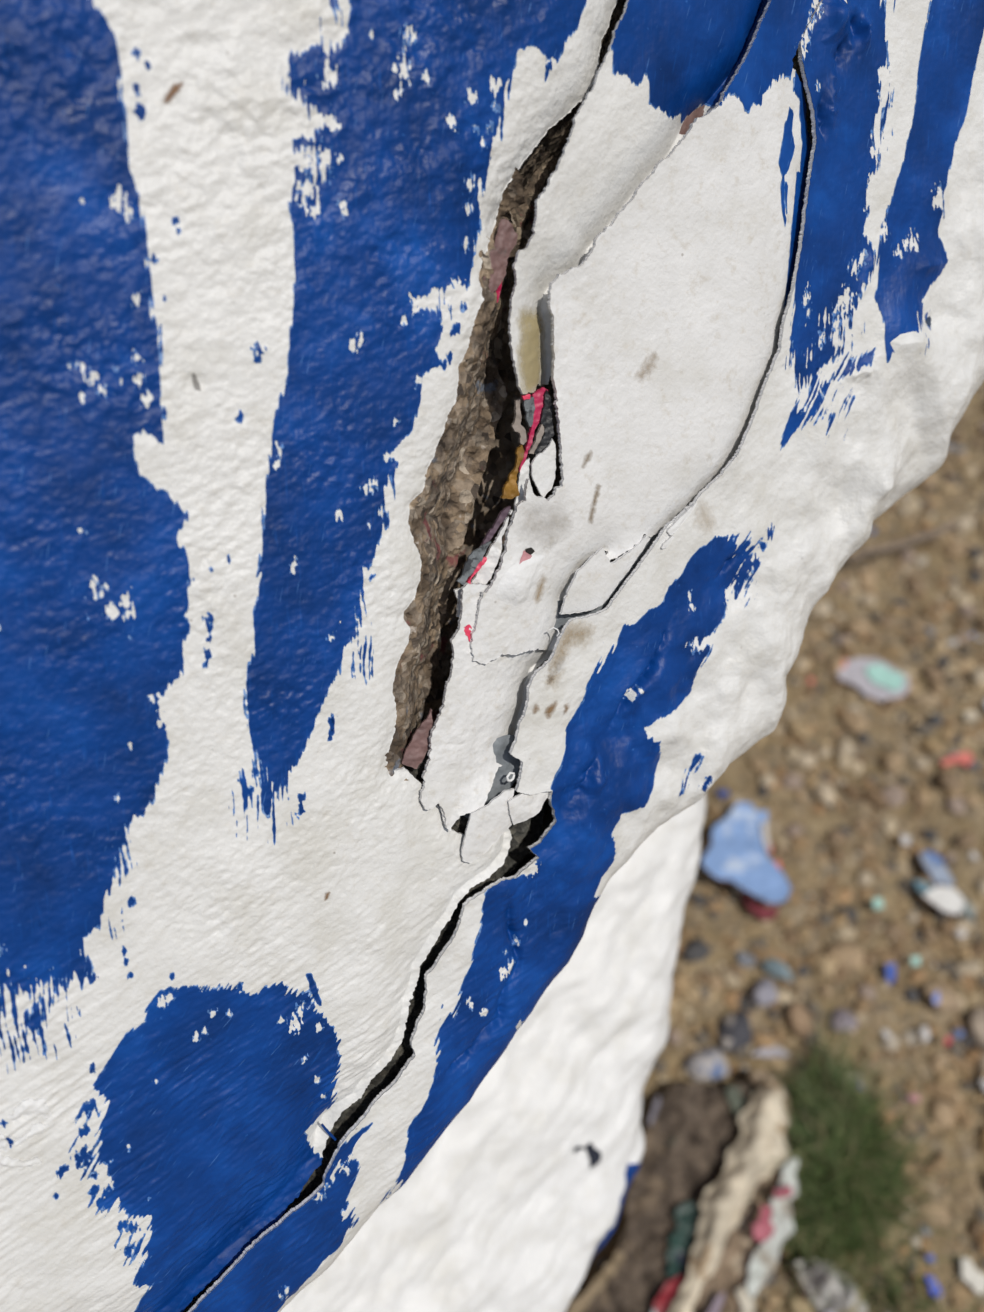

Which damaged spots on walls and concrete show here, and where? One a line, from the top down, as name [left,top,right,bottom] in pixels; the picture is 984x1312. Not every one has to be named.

crack [499,6,617,257]
crack [679,104,705,135]
peeling [385,0,821,863]
crack [554,533,658,630]
crack [183,735,544,1312]